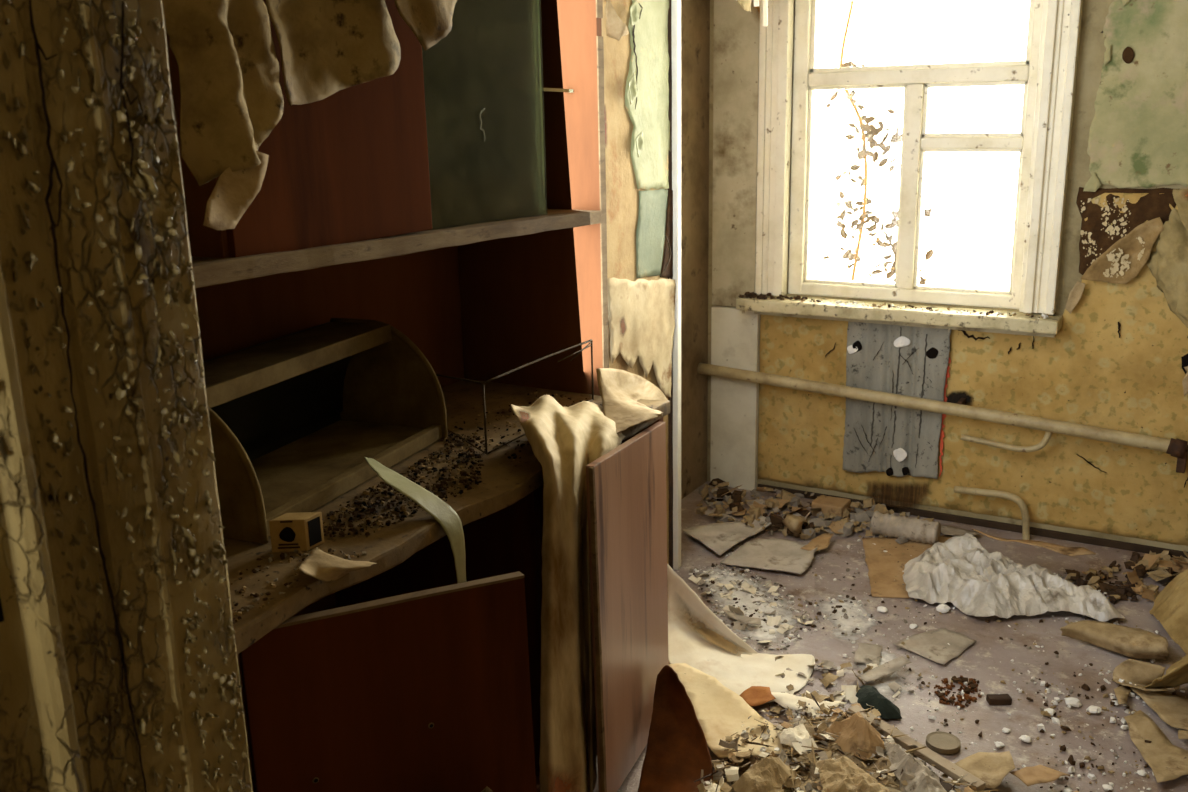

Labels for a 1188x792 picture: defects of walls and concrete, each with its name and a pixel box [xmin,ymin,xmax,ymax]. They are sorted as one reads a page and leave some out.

crack [29,0,147,792]